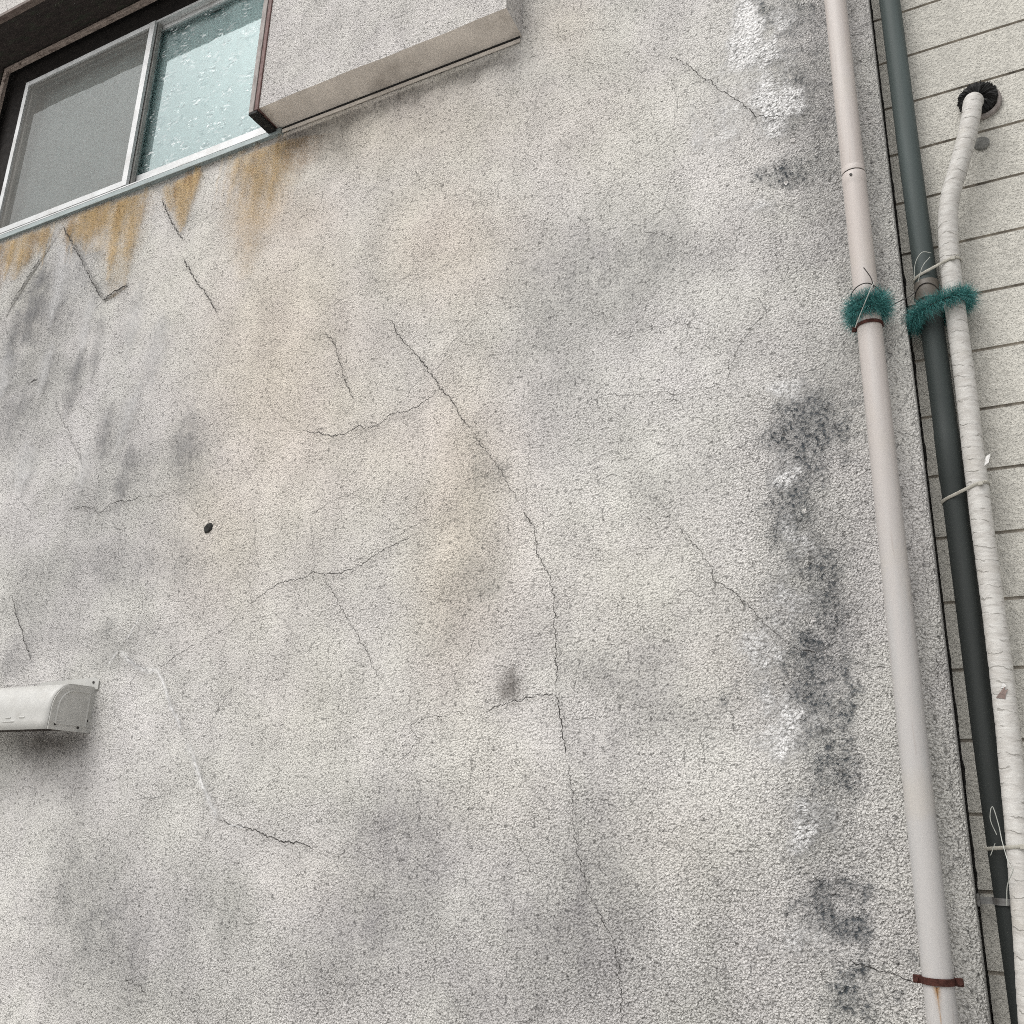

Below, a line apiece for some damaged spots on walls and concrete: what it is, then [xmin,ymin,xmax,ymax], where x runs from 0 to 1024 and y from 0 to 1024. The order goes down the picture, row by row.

water stain [752,0,814,34]
crack [662,44,787,148]
crack [64,227,126,307]
crack [162,201,217,313]
water stain [765,391,849,542]
crack [122,533,417,676]
crack [275,320,624,1024]
water stain [780,548,860,791]
crack [205,820,345,854]
water stain [813,878,871,940]
water stain [831,963,874,1021]